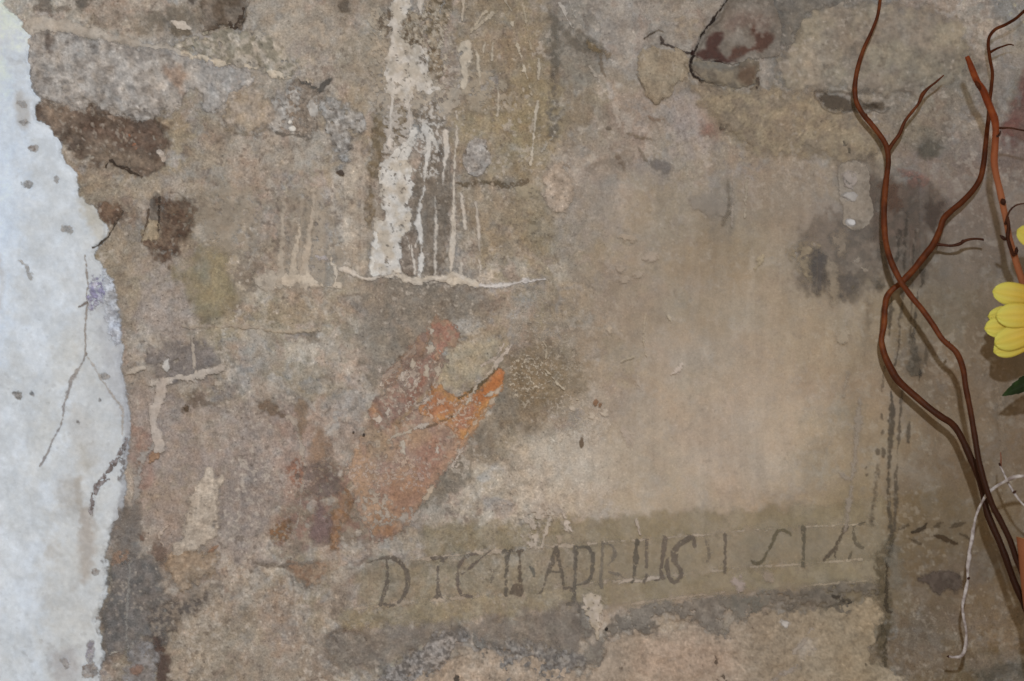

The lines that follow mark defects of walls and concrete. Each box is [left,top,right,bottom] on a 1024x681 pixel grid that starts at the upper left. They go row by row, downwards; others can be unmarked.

spalling [34,0,92,11]
crack [644,29,691,54]
spalling [17,101,171,178]
water stain [274,0,546,292]
spalling [140,193,195,269]
peeling [87,269,122,345]
crack [40,210,128,514]
water stain [871,390,910,668]
spalling [82,640,98,678]
spalling [376,573,904,681]